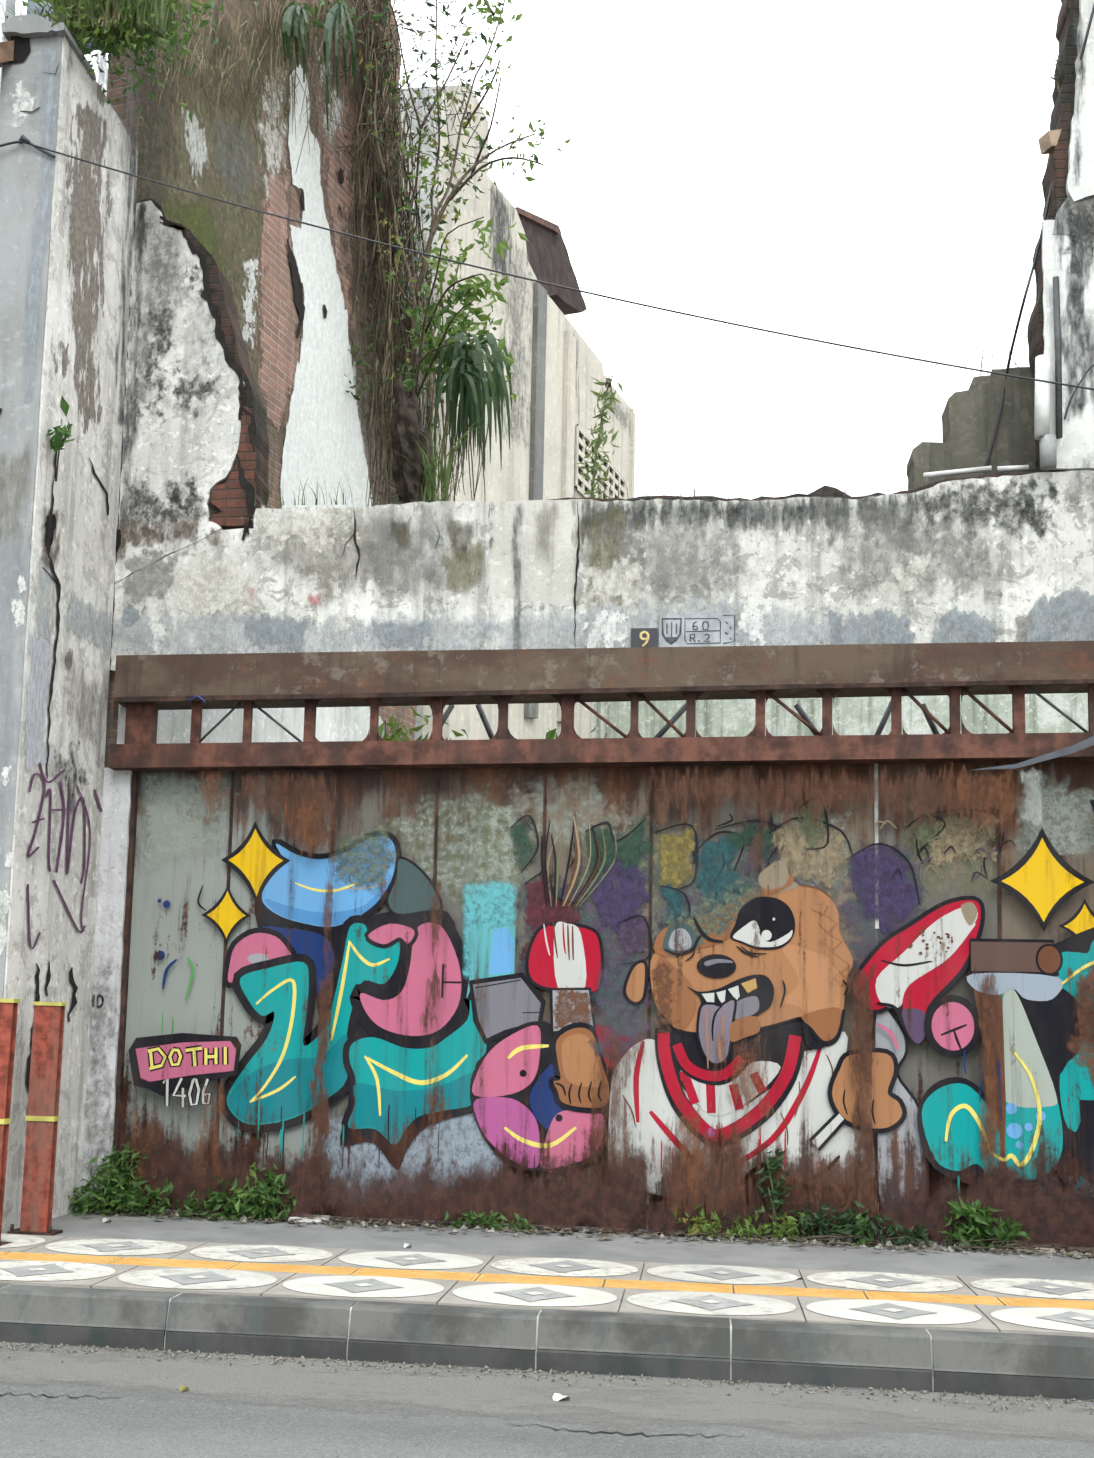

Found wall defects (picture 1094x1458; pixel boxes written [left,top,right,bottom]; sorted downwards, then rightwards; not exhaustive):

leakage [116,53,219,465]
leakage [490,185,533,436]
leakage [1057,200,1094,412]
peeling [1067,196,1094,240]
peeling [1,47,997,786]
leakage [120,477,212,546]
crack [342,510,360,580]
leakage [512,506,554,647]
leakage [574,446,1089,607]
peeling [1015,587,1094,642]
corrosion [110,761,1094,1254]